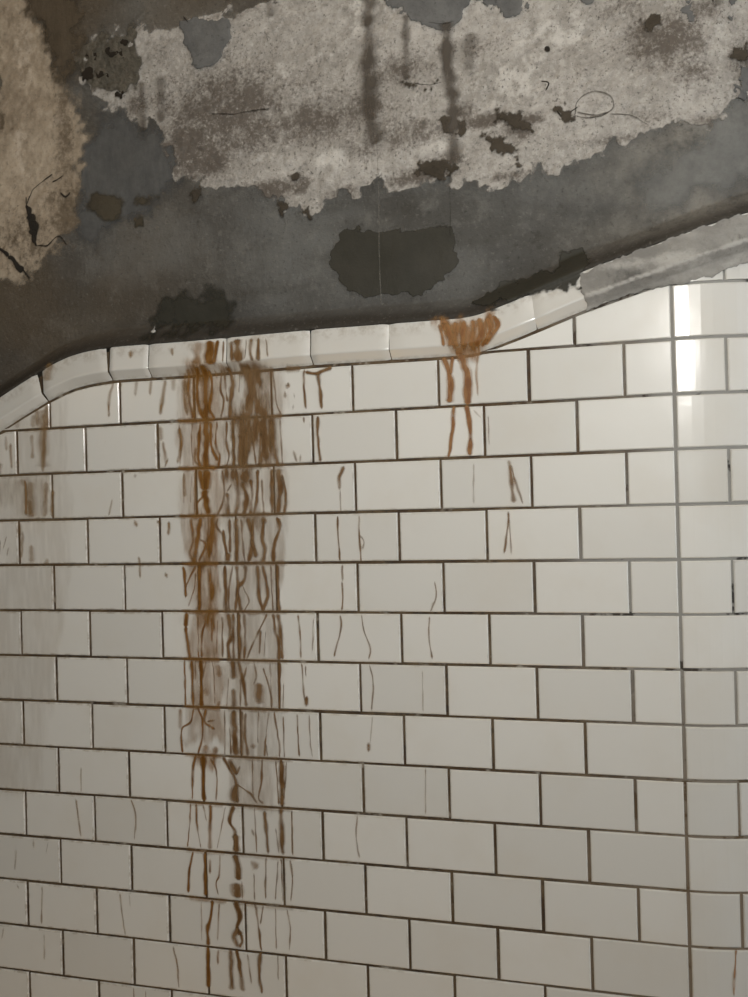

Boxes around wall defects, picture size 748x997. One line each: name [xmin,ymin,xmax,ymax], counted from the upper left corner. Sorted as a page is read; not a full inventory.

crack [0,248,30,278]
spalling [0,0,88,285]
crack [25,174,70,246]
leakage [361,0,382,143]
leakage [329,225,459,298]
spalling [71,0,748,220]
leakage [441,23,459,163]
corrosion [287,366,332,461]
corrosion [438,312,500,457]
corrosion [178,338,293,993]
corrosion [297,616,313,756]